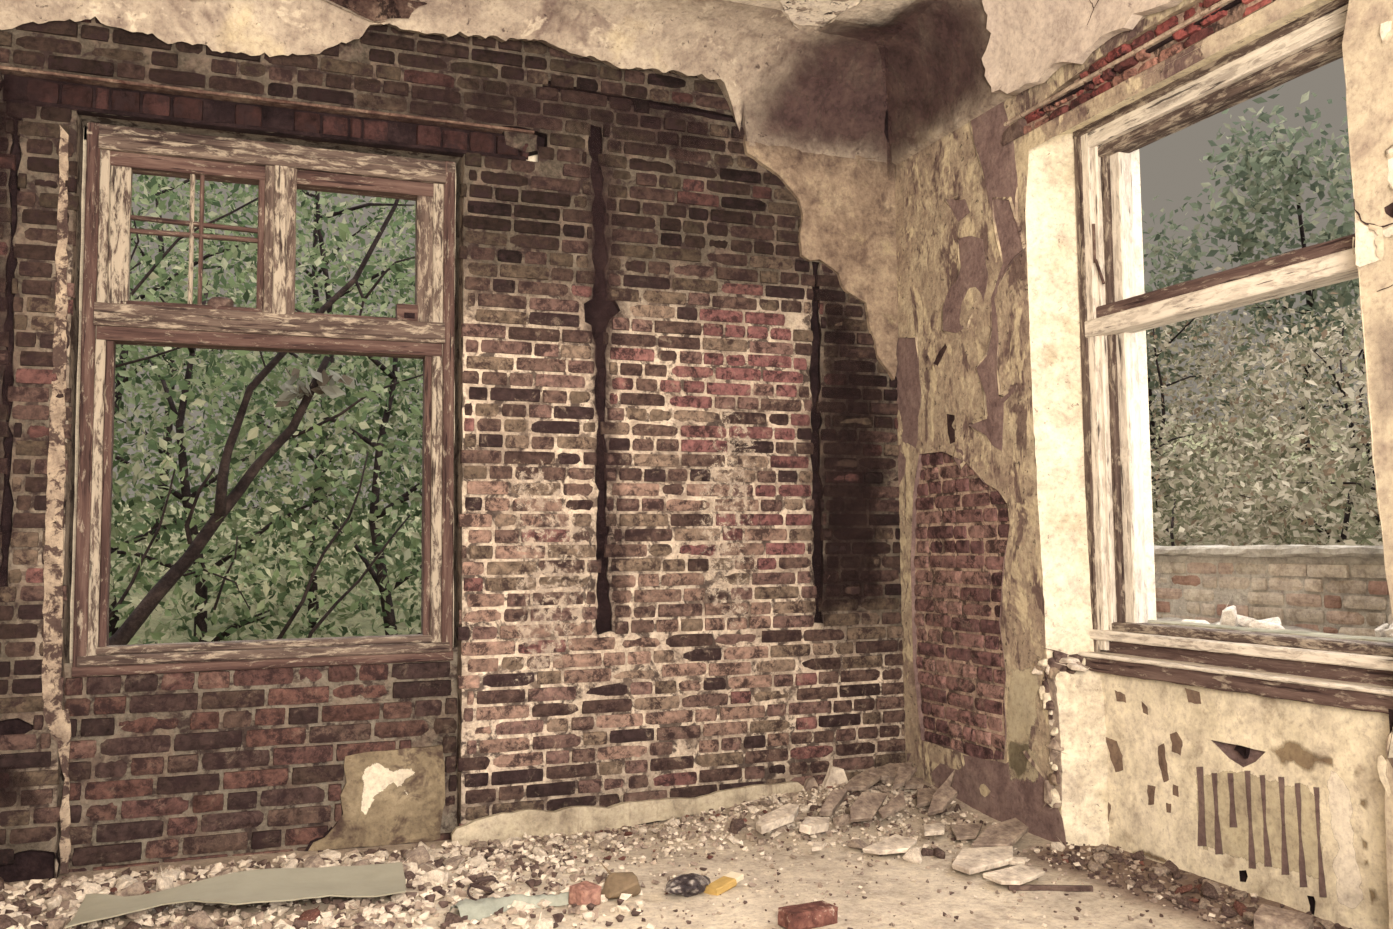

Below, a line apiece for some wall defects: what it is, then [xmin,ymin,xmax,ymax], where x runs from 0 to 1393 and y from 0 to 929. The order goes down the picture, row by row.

peeling [325,0,430,25]
peeling [1377,21,1393,47]
leakage [762,1,985,160]
spalling [502,126,548,156]
peeling [1352,143,1393,267]
spalling [743,0,1276,847]
spalling [1377,709,1393,797]